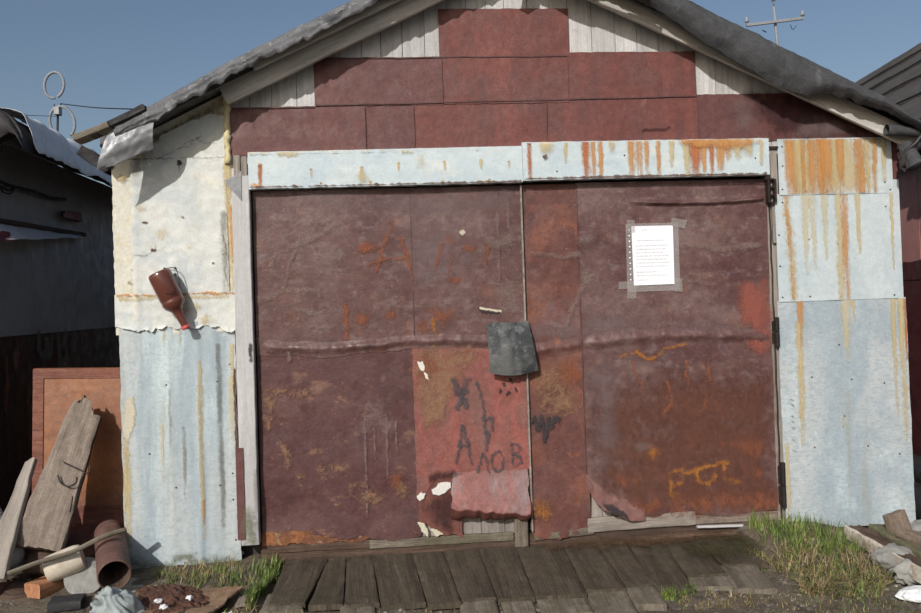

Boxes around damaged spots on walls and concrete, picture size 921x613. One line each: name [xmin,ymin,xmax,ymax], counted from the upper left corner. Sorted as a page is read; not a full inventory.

rust [249,138,767,188]
rust [784,138,886,347]
rust [783,205,805,420]
rust [891,298,907,402]
peeling [417,471,456,537]